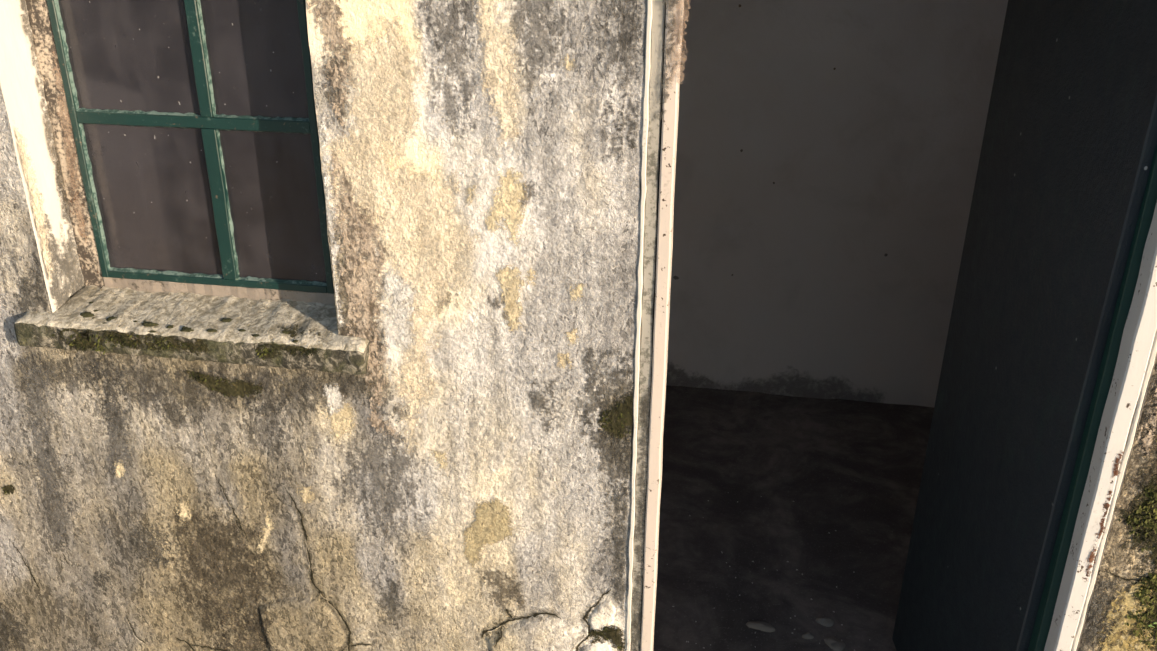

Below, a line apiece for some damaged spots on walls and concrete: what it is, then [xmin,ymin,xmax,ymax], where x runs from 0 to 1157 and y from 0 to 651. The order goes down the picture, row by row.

damp [509,0,574,92]
damp [591,0,642,161]
damp [0,0,86,317]
damp [9,43,430,551]
crack [124,616,145,645]
crack [177,638,227,651]
damp [129,494,289,651]
crack [217,481,250,546]
crack [286,490,372,651]
crack [481,586,622,651]
damp [1079,578,1123,651]
rust [1082,452,1124,582]